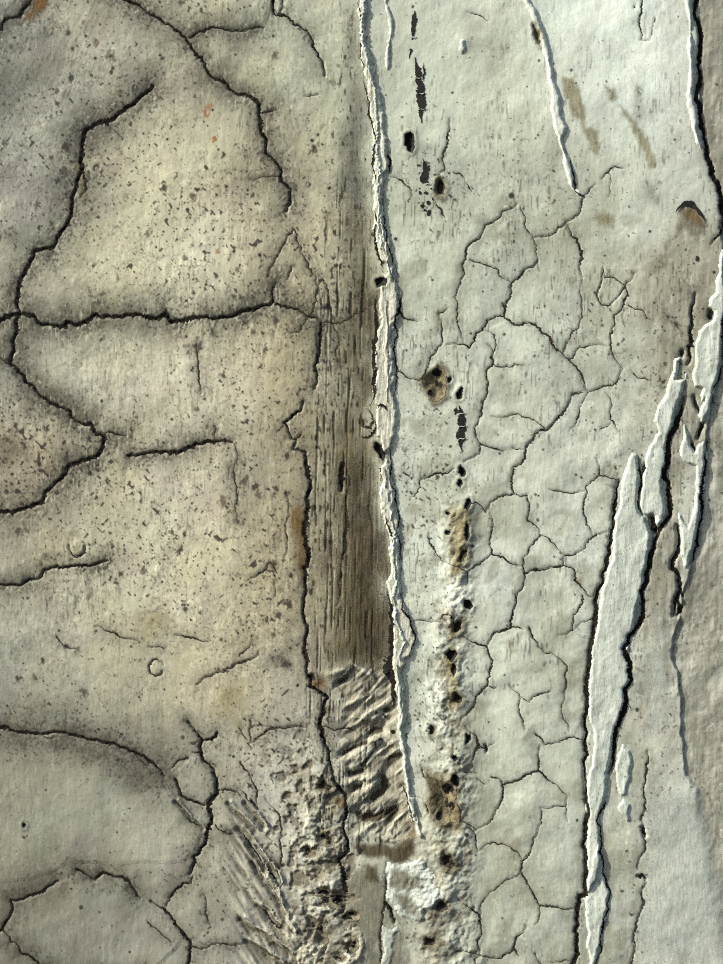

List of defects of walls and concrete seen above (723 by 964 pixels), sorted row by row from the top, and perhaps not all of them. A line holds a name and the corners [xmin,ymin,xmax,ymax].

crack [387,155,412,194]
crack [435,122,471,190]
crack [693,0,723,244]
crack [0,0,373,964]
peeling [229,0,443,964]
damp [329,365,390,663]
crack [395,155,723,964]
peeling [585,249,723,964]
crack [378,866,396,964]